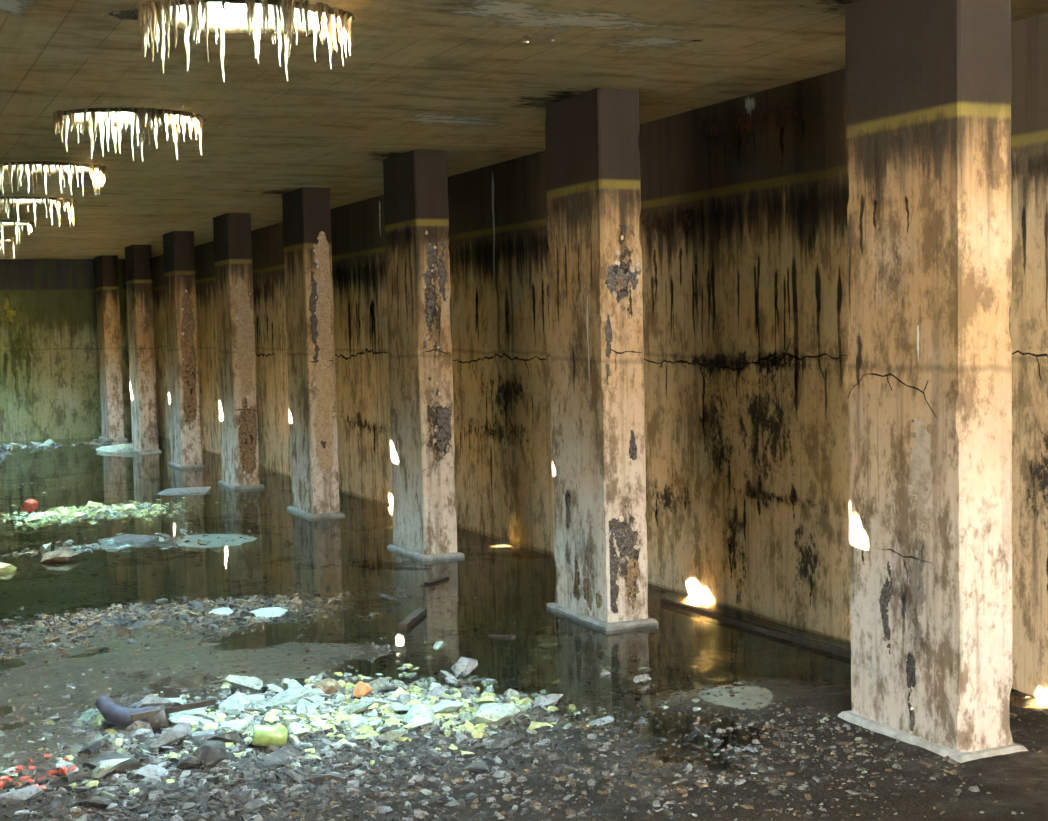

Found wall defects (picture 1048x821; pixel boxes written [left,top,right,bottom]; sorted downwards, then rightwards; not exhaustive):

spalling [605,225,641,303]
damp [651,276,674,338]
crack [423,349,550,387]
spalling [605,314,613,384]
crack [605,338,937,418]
damp [657,113,948,604]
crack [1012,350,1048,381]
damp [647,480,690,525]
spalling [573,516,641,613]
damp [613,502,640,601]